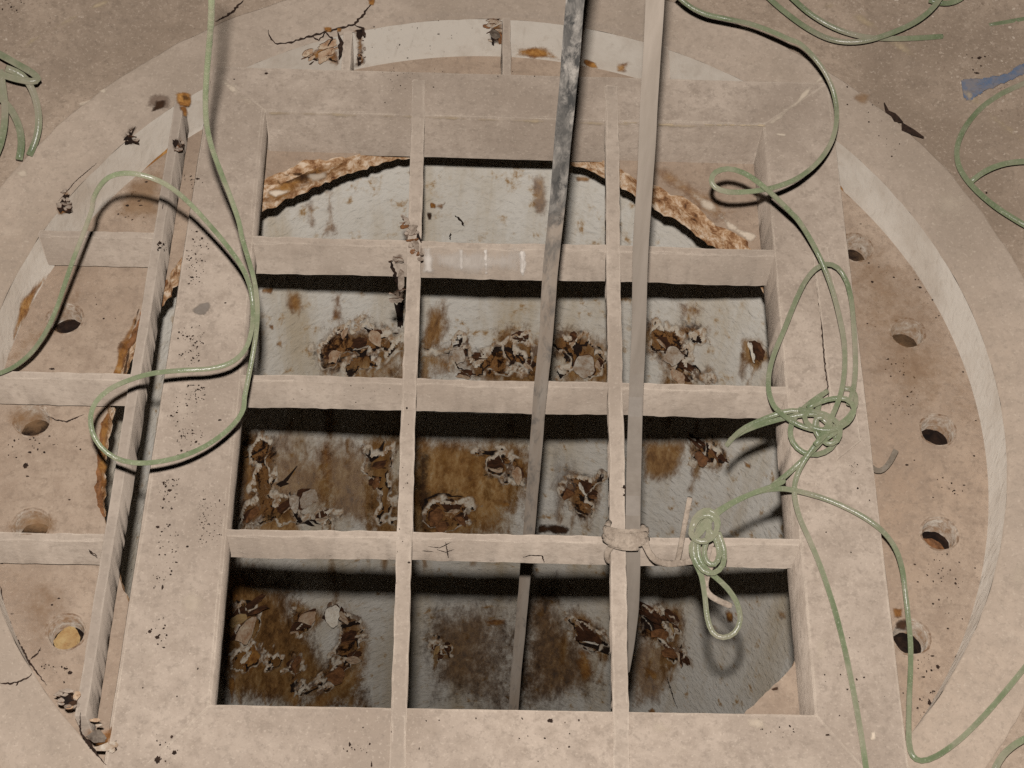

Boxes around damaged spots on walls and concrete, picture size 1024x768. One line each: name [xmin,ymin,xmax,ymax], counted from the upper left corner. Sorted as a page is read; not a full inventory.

crack [268,4,371,58]
corrosion [263,157,345,199]
corrosion [652,185,756,250]
peeling [308,214,424,395]
peeling [418,323,538,381]
peeling [552,323,607,382]
peeling [646,317,717,385]
corrosion [94,414,109,517]
peeling [153,429,344,589]
peeling [360,440,491,552]
corrosion [413,435,529,534]
peeling [228,591,370,707]